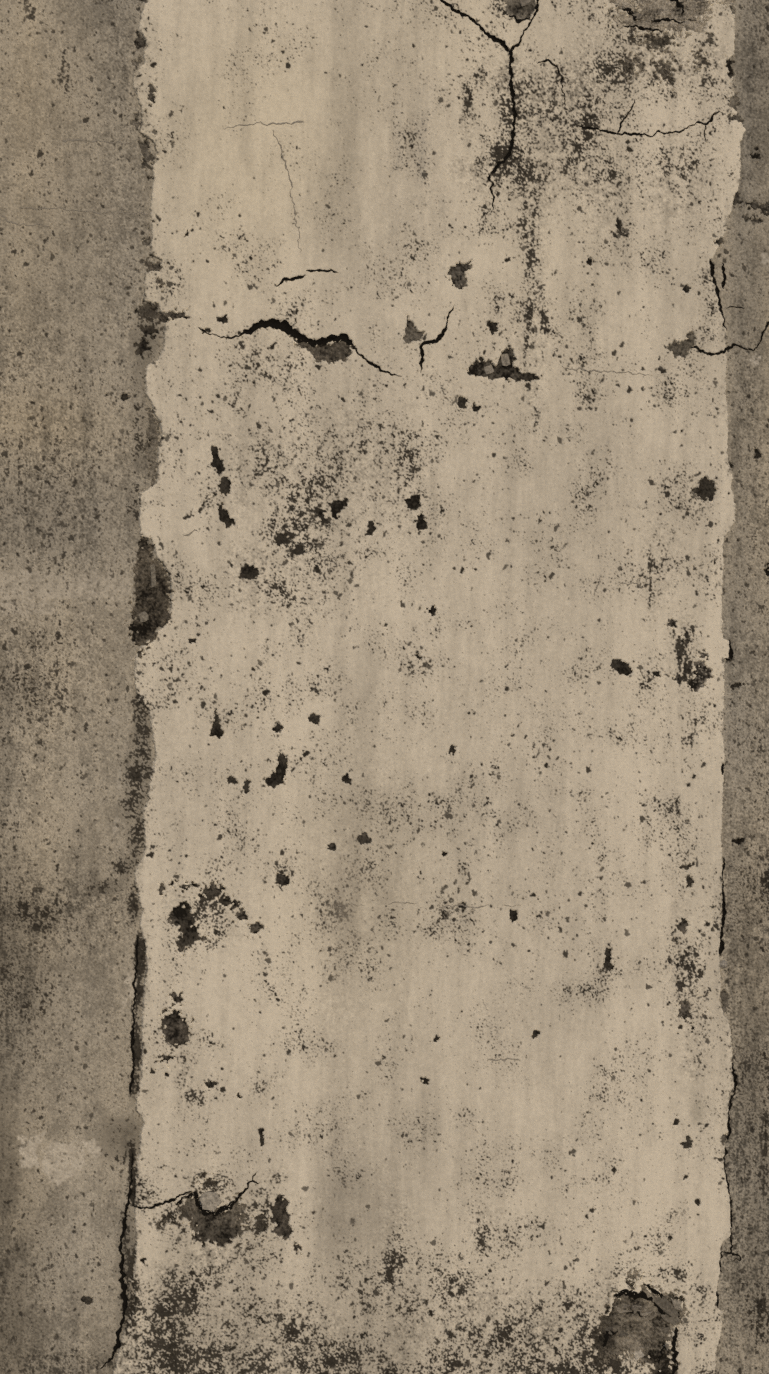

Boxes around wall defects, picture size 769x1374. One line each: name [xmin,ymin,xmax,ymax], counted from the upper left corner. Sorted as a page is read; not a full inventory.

spalling [607,0,735,38]
crack [440,0,720,210]
spalling [727,65,743,122]
crack [198,121,454,376]
crack [693,306,769,356]
spalling [124,538,175,658]
spalling [157,1181,302,1255]
spalling [593,1268,690,1374]